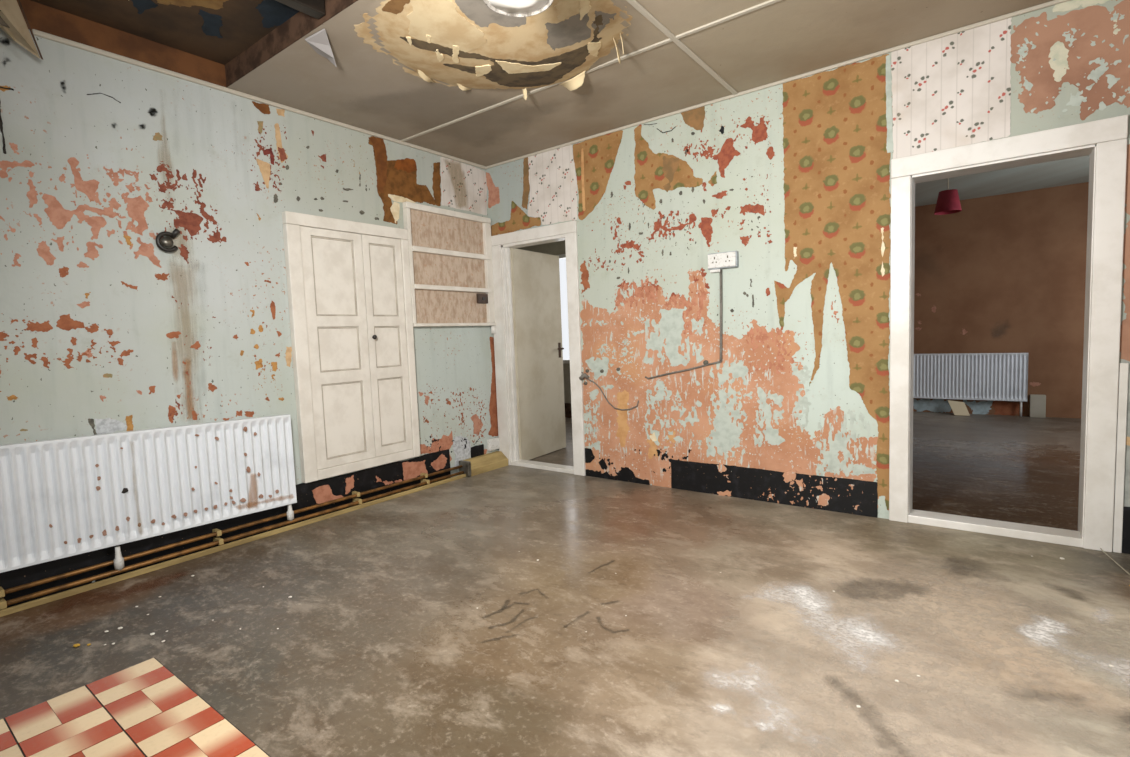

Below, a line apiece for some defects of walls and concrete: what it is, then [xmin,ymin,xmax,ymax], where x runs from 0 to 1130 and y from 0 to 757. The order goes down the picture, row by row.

peeling [128,0,228,38]
peeling [1010,0,1130,121]
crack [0,86,14,154]
peeling [249,101,367,203]
peeling [0,142,227,281]
peeling [1120,133,1130,361]
peeling [0,292,133,401]
peeling [168,361,208,423]
peeling [166,331,212,361]
peeling [233,301,292,407]
peeling [579,106,878,510]
leakage [1120,360,1130,507]